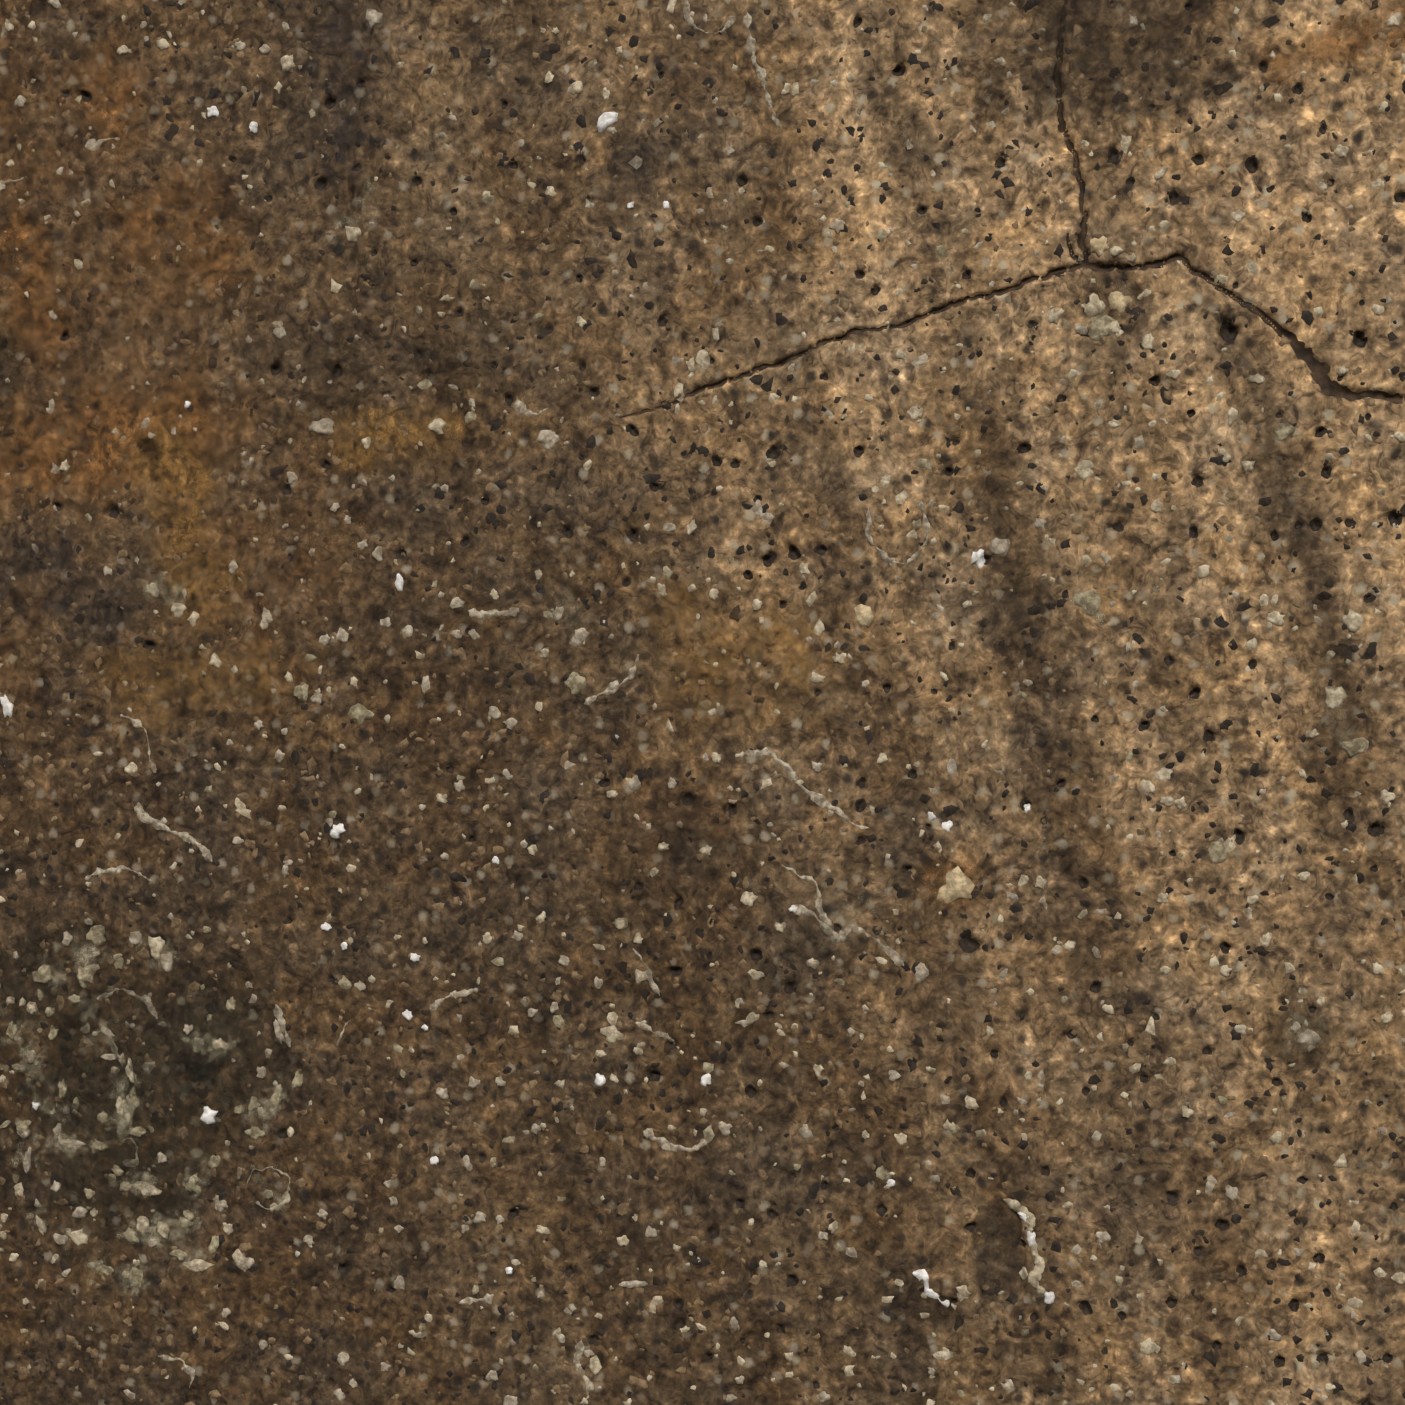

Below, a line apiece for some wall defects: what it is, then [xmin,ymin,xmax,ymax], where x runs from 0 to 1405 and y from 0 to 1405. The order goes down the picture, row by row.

crack [619,0,1405,418]